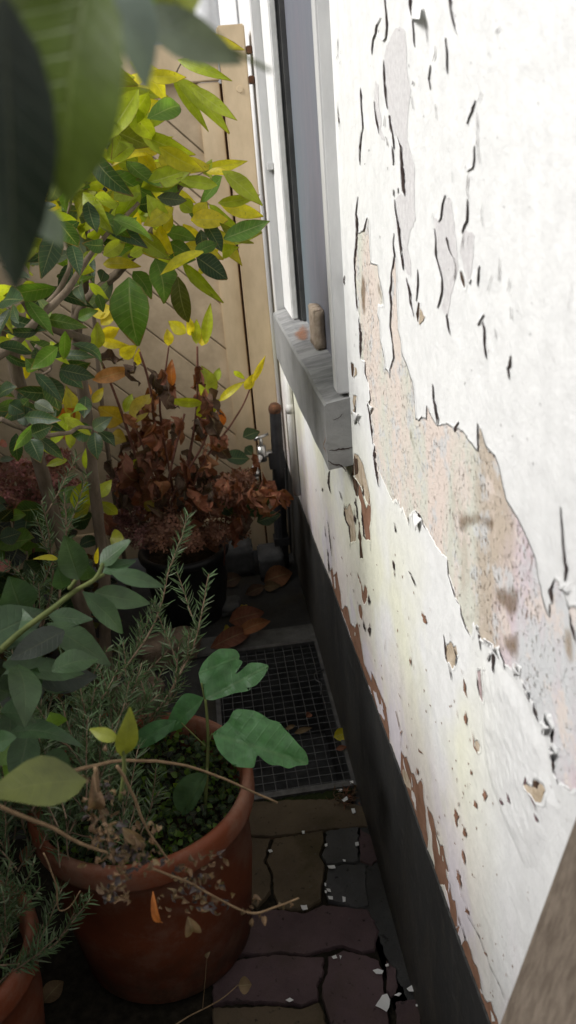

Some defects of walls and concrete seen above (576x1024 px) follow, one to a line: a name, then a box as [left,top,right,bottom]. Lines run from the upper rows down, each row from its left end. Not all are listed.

crack [337,0,456,165]
crack [400,254,418,317]
crack [445,91,511,378]
peeling [325,27,576,1024]